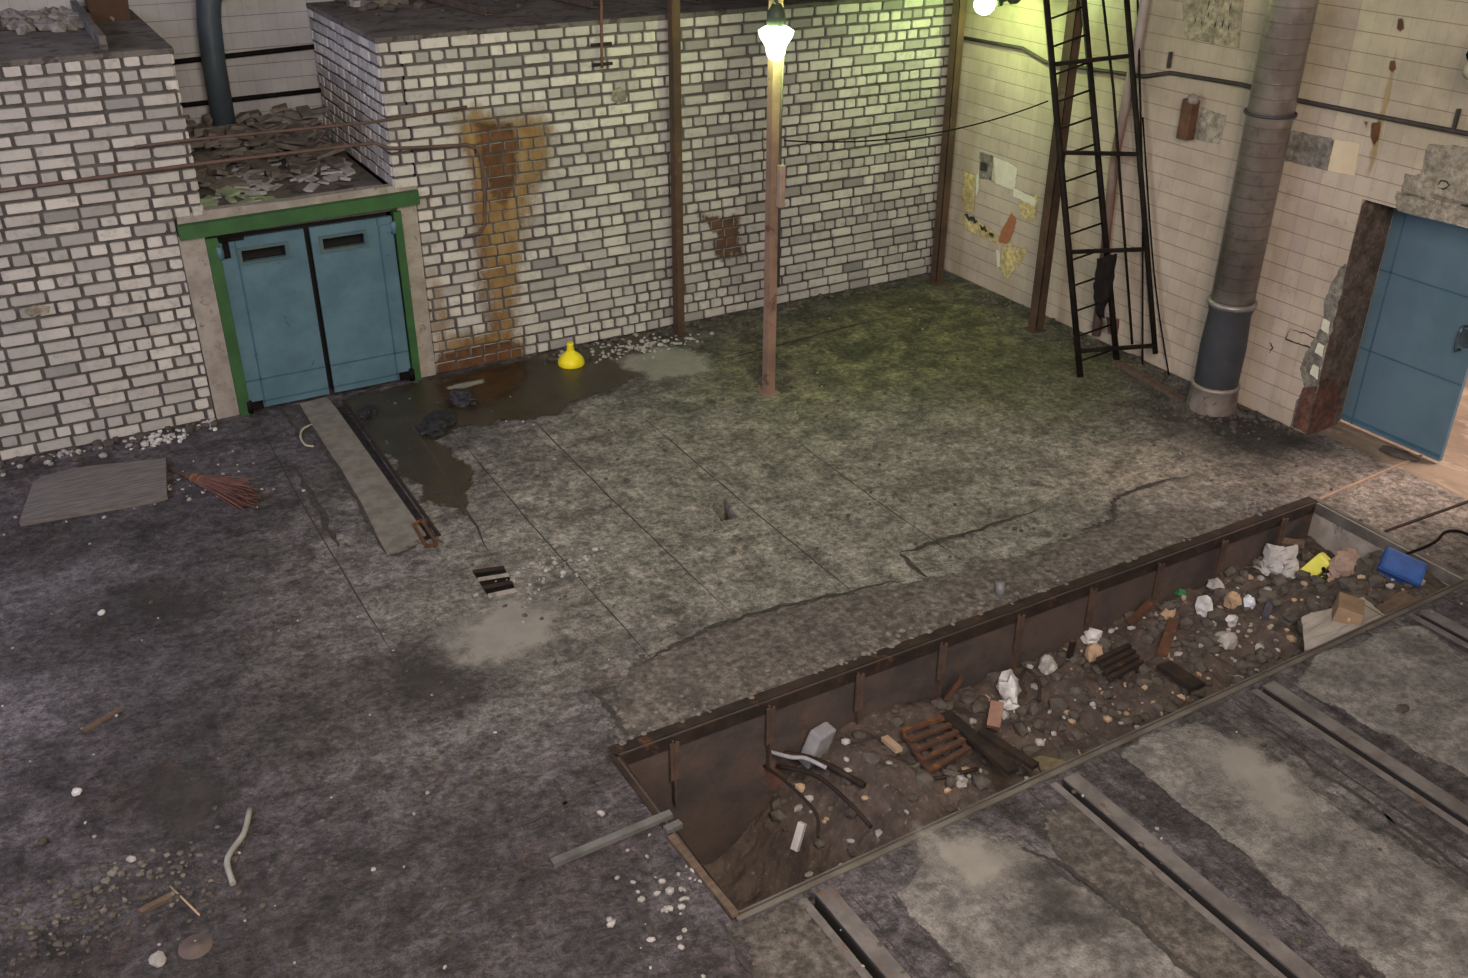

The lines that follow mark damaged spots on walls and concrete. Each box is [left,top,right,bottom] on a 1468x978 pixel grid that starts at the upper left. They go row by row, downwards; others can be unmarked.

peeling [1182,0,1244,48]
corrosion [437,110,548,373]
water stain [345,329,712,516]